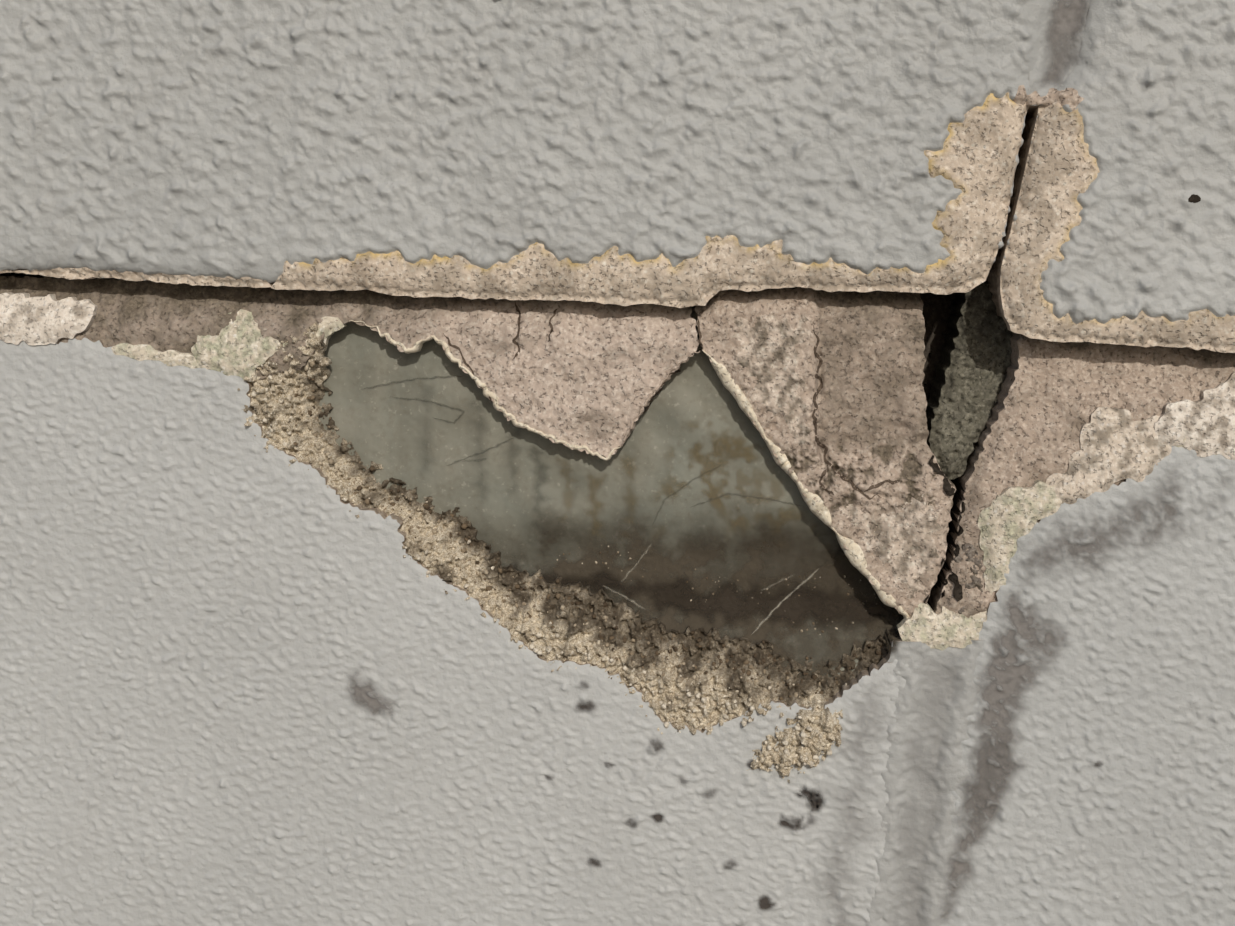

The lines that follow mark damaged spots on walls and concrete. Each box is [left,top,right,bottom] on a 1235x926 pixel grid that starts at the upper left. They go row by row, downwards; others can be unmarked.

spalling [0,85,1235,783]
damp [1029,487,1177,565]
damp [950,596,1063,894]